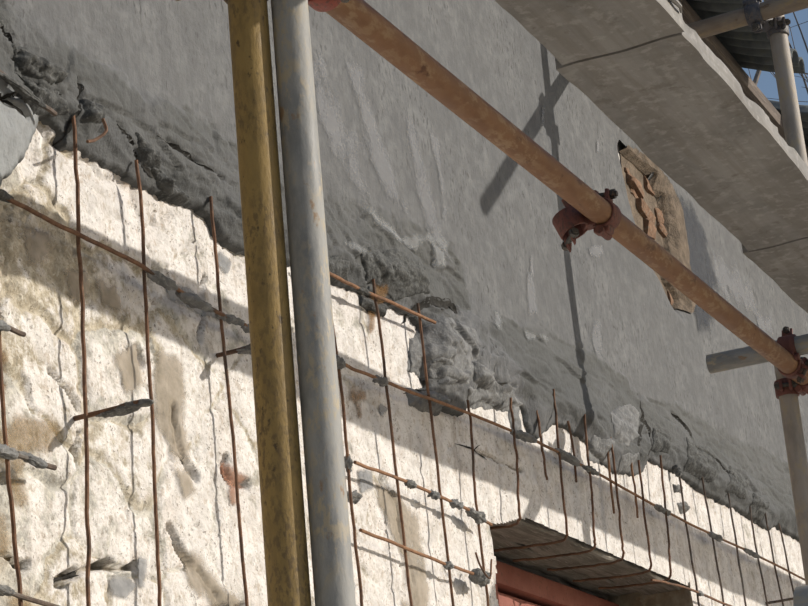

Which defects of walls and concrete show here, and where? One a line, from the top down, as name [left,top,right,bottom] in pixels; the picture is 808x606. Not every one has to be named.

crack [0,25,26,119]
crack [53,76,84,146]
crack [116,121,155,178]
crack [157,135,222,177]
spalling [619,145,692,271]
peeling [66,271,121,310]
spalling [653,270,696,313]
peeling [115,345,143,392]
peeling [155,351,189,459]
rust [220,464,245,504]
peeling [378,484,429,606]
peeling [176,548,238,606]